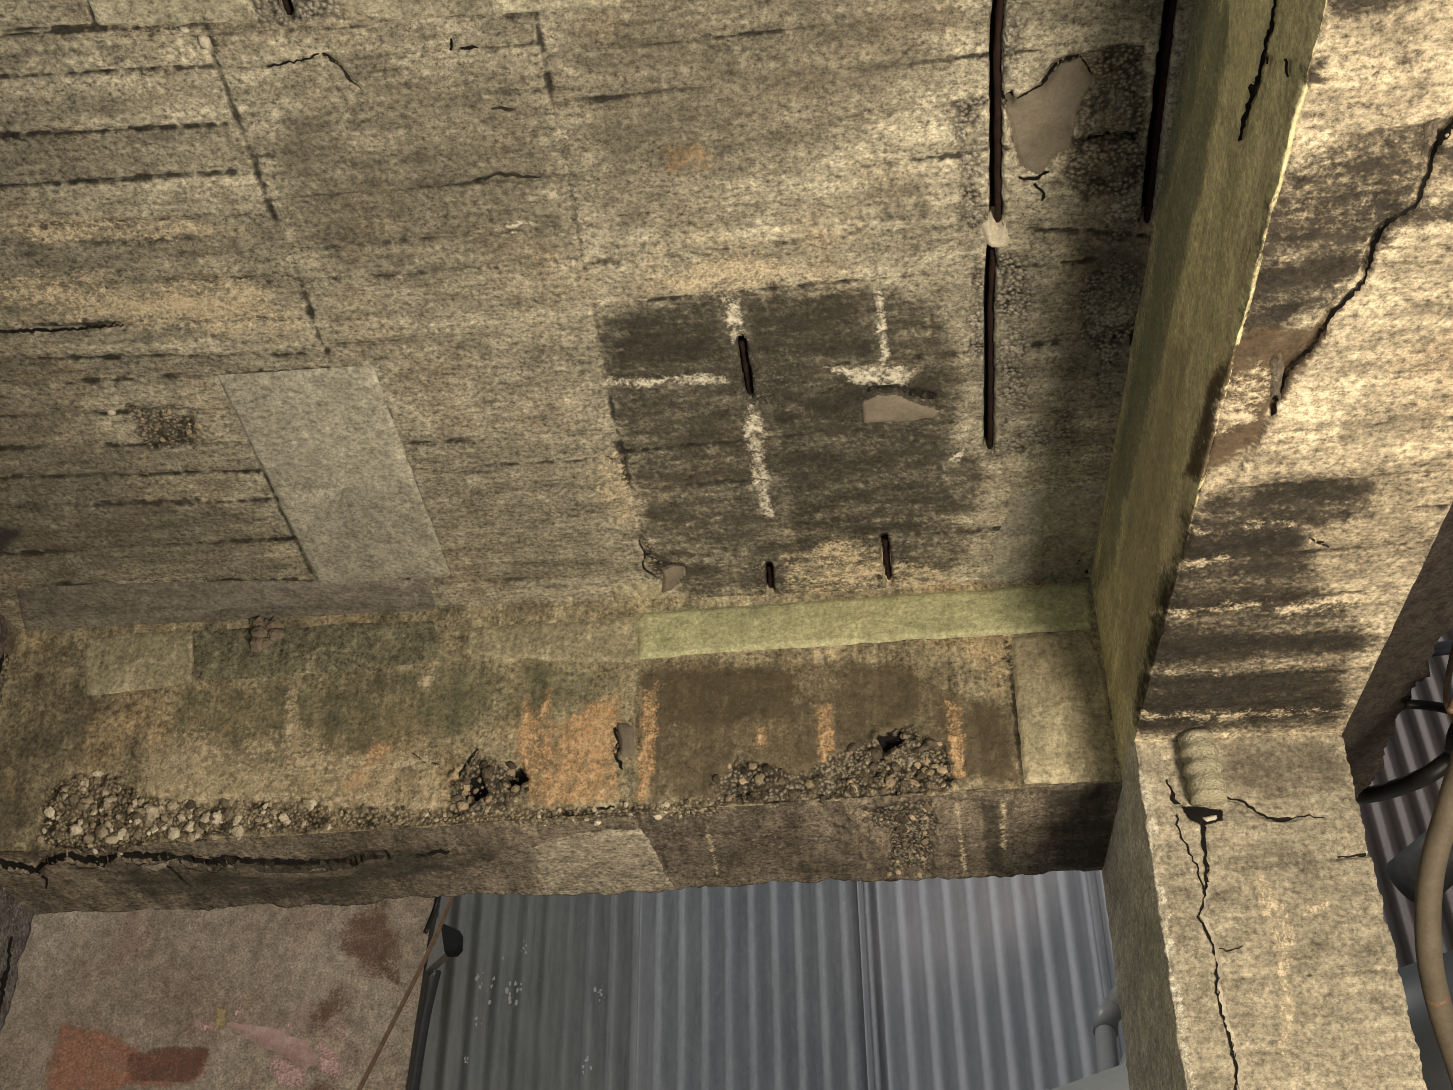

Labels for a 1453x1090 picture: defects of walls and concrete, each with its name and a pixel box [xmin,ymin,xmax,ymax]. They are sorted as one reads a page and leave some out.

spalling [250,0,345,26]
crack [1238,0,1289,141]
spalling [951,0,1178,464]
crack [1268,117,1453,416]
damp [596,257,994,597]
spalling [804,370,942,423]
damp [1132,123,1453,741]
crack [0,844,450,889]
spalling [36,725,959,878]
corrosion [518,691,622,807]
corrosion [637,682,659,800]
crack [1166,779,1325,1090]